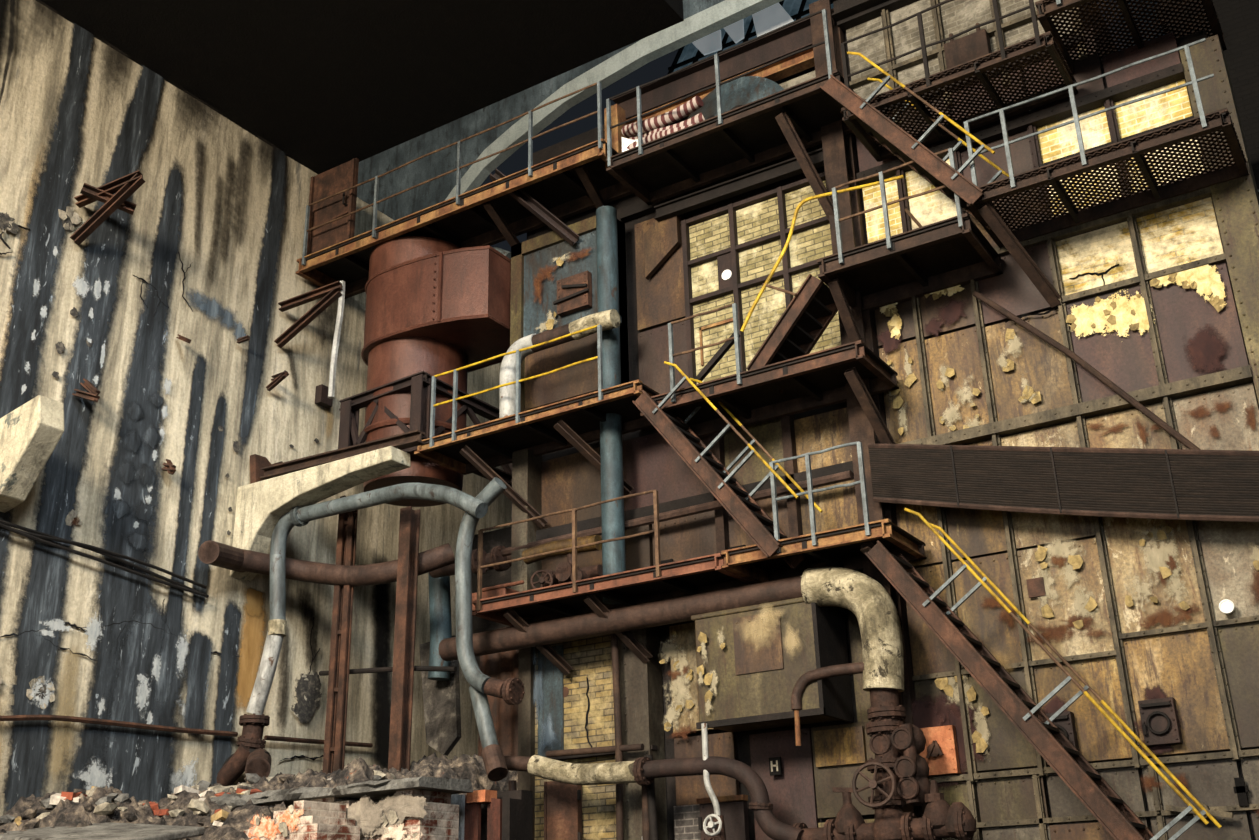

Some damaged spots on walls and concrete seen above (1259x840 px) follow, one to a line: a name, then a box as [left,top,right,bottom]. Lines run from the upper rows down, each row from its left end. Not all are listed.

peeling [1066,258,1227,338]
peeling [998,328,1042,404]
damp [0,23,286,815]
crack [0,599,240,661]
damp [299,589,317,672]
corrosion [1028,615,1104,643]
corrosion [1139,604,1199,629]
corrosion [1250,569,1259,603]
damp [277,627,289,726]
crack [584,677,592,747]
peeling [659,631,725,732]
spalling [244,791,428,840]